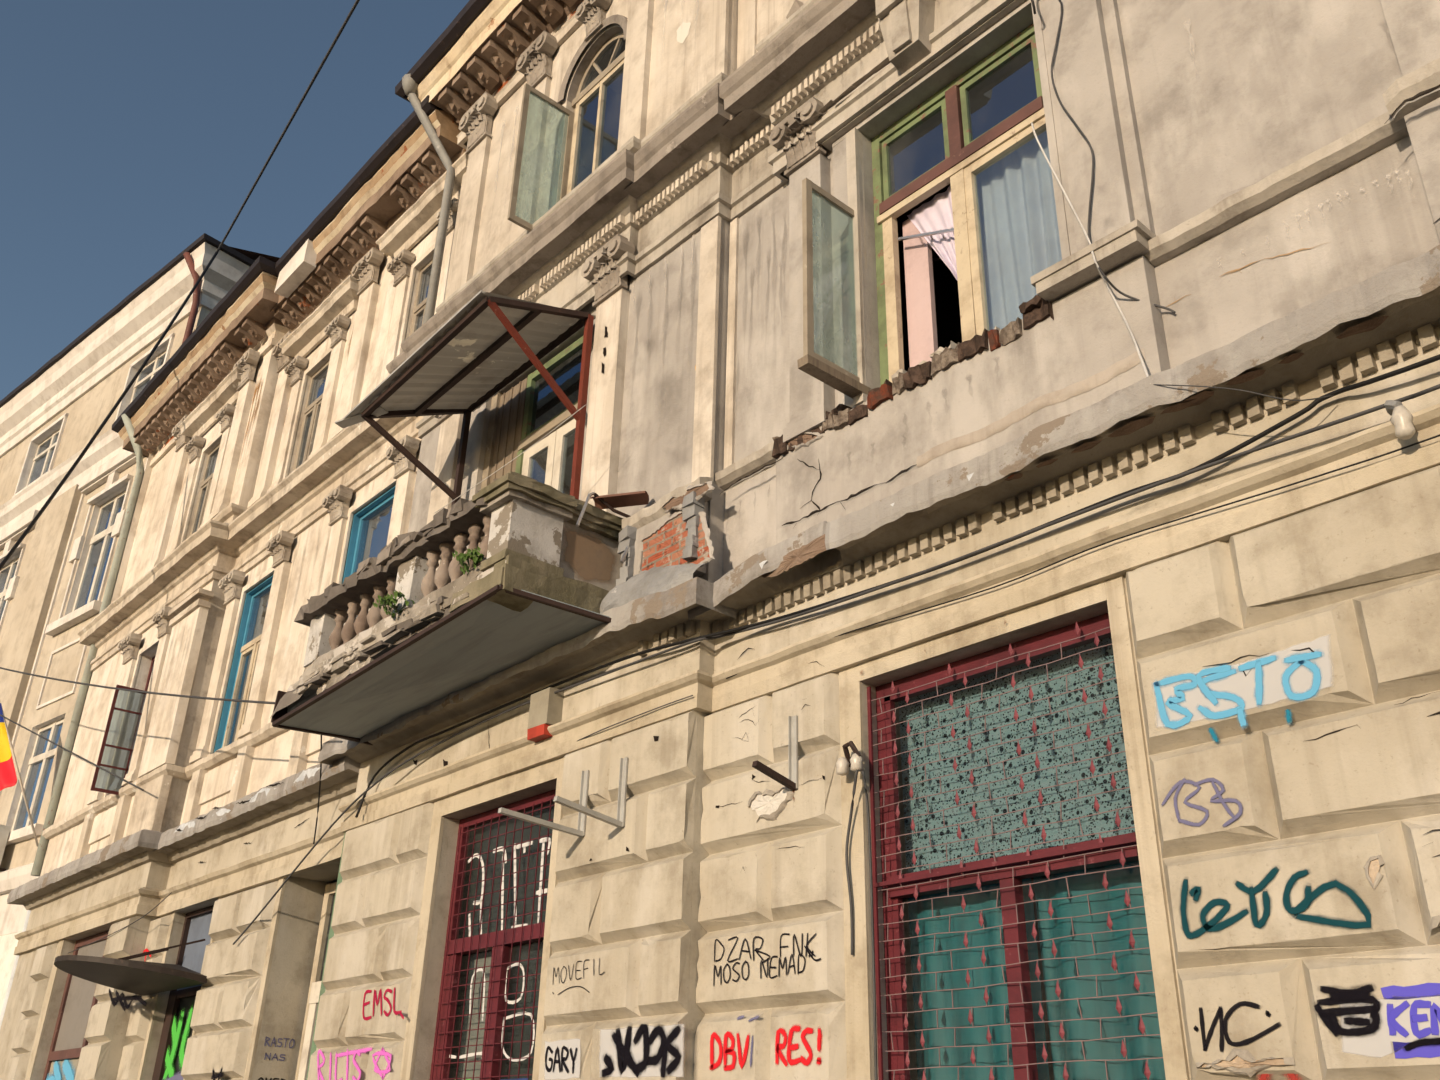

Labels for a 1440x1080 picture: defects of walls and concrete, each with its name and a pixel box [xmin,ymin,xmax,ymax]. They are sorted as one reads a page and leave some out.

crack [1385,84,1440,126]
crack [720,456,918,527]
flaking render [638,481,715,573]
flaking render [758,534,826,578]
flaking render [748,787,794,822]
flaking render [1363,855,1385,890]
flaking render [1196,1048,1295,1078]